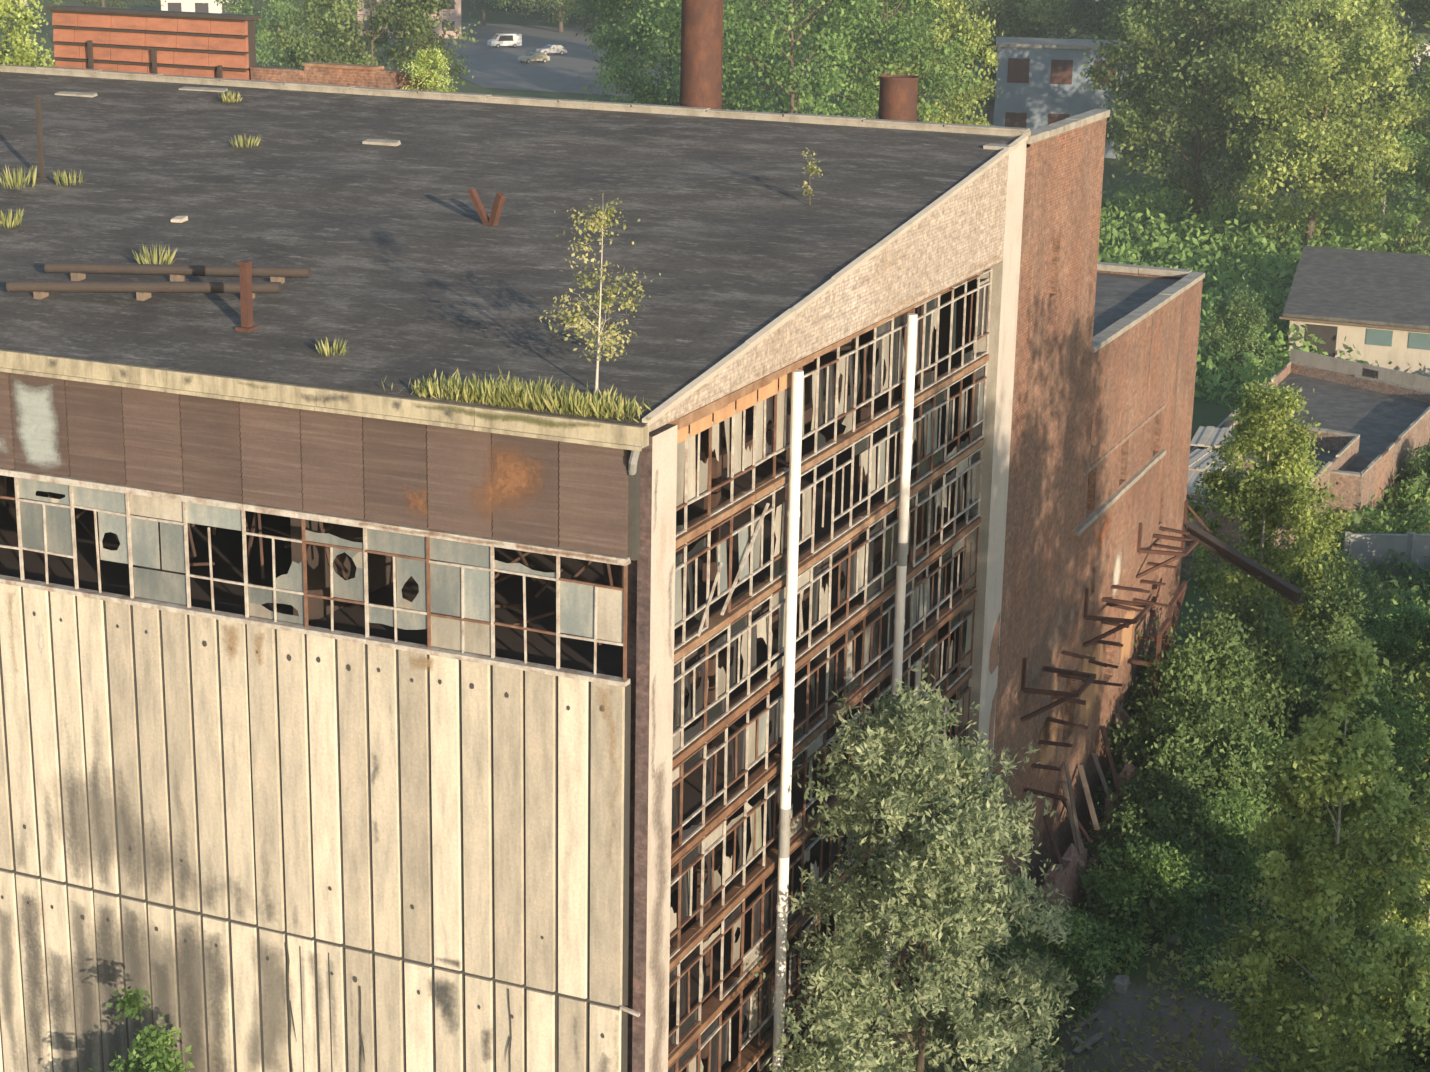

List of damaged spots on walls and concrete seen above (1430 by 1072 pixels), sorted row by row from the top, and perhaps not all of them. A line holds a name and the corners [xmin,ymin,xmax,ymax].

peeling [16,385,57,464]
corrosion [484,453,532,509]
leakage [434,983,453,1022]